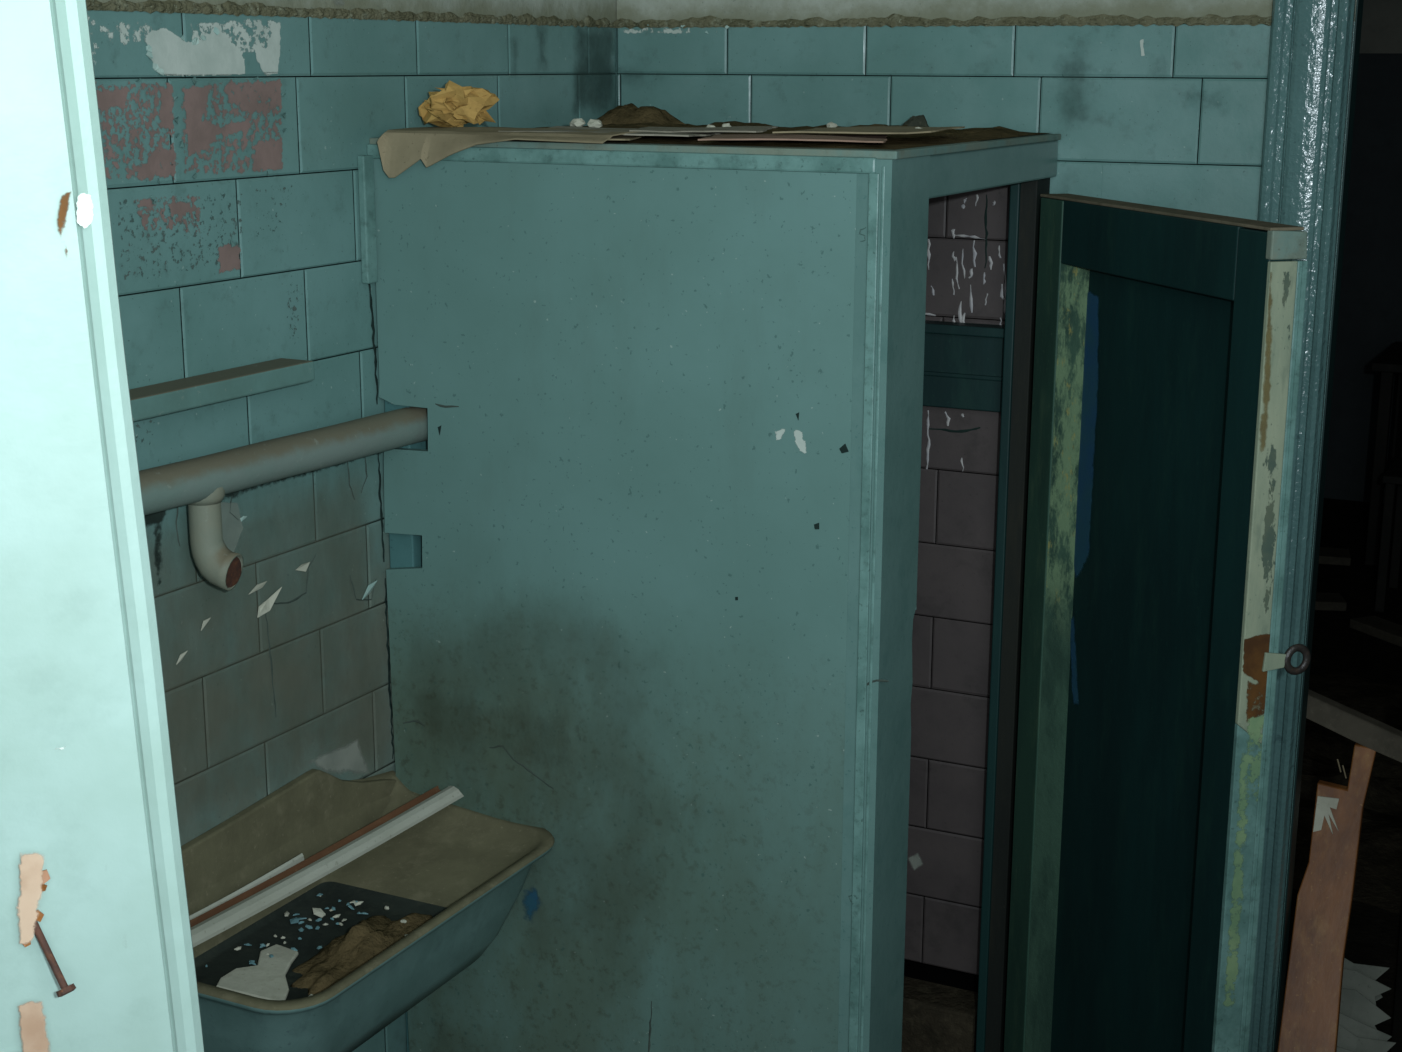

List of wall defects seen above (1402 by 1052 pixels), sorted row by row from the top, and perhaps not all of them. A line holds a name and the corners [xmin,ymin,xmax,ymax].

peeling [88,17,292,280]
spalling [76,193,94,228]
leakage [145,510,165,584]
peeling [248,581,282,618]